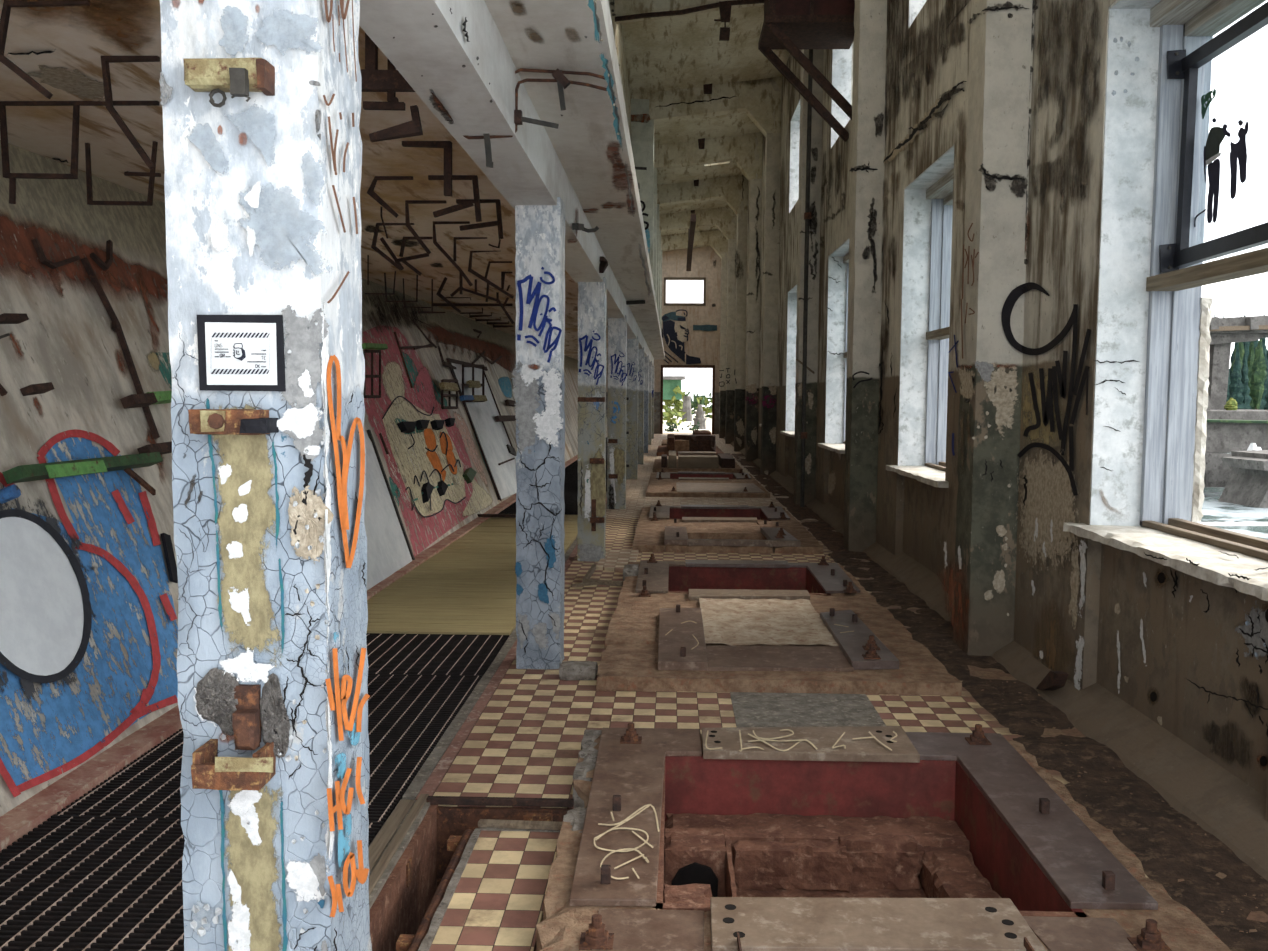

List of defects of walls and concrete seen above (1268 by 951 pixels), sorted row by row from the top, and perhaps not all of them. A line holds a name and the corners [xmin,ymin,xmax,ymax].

peeling [211,150,330,275]
damp [862,152,912,292]
crack [850,81,967,173]
damp [874,0,967,137]
crack [979,164,1028,198]
damp [1025,0,1100,239]
peeling [512,362,564,454]
peeling [218,464,252,523]
peeling [228,587,252,626]
crack [283,584,360,778]
flaking render [984,447,1088,690]
crack [1144,551,1268,737]